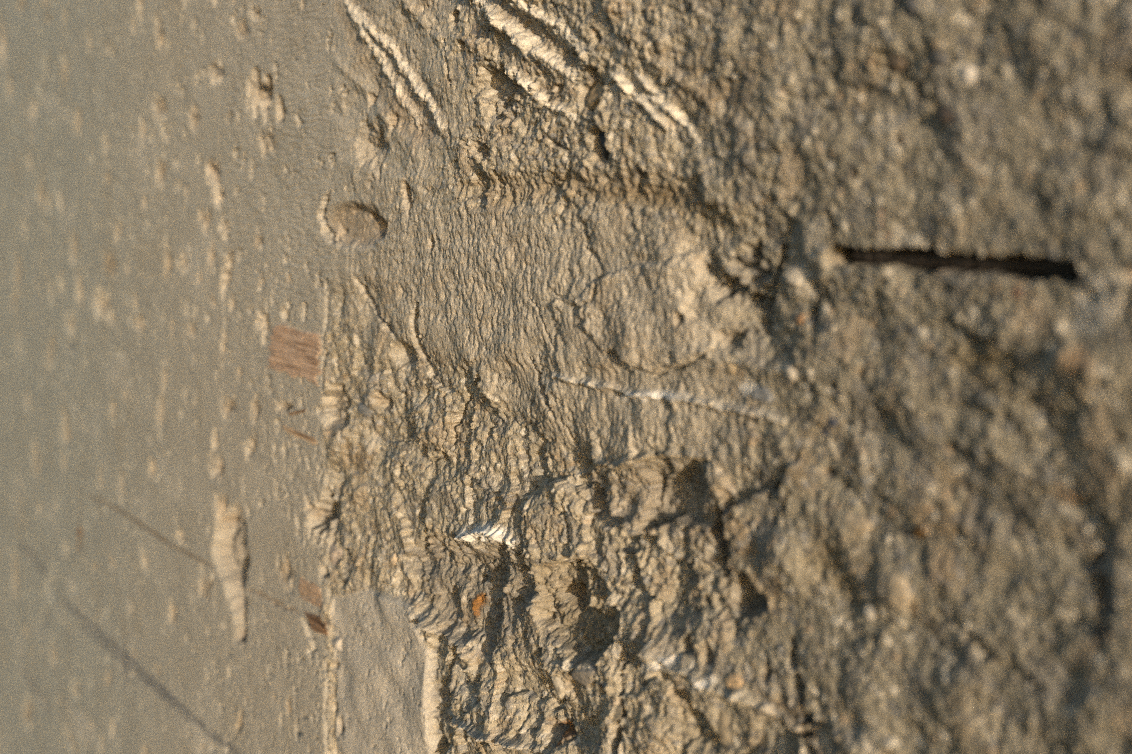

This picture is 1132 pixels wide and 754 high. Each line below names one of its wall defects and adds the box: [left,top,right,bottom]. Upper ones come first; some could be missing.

spalling [450,8,564,127]
spalling [348,91,401,182]
spalling [318,193,388,250]
spalling [457,62,790,375]
spalling [316,381,355,434]
spalling [367,373,394,413]
spalling [389,337,419,369]
spalling [303,484,341,585]
spalling [574,461,769,630]
spalling [796,521,870,613]
spalling [412,524,625,754]
spalling [659,634,728,754]